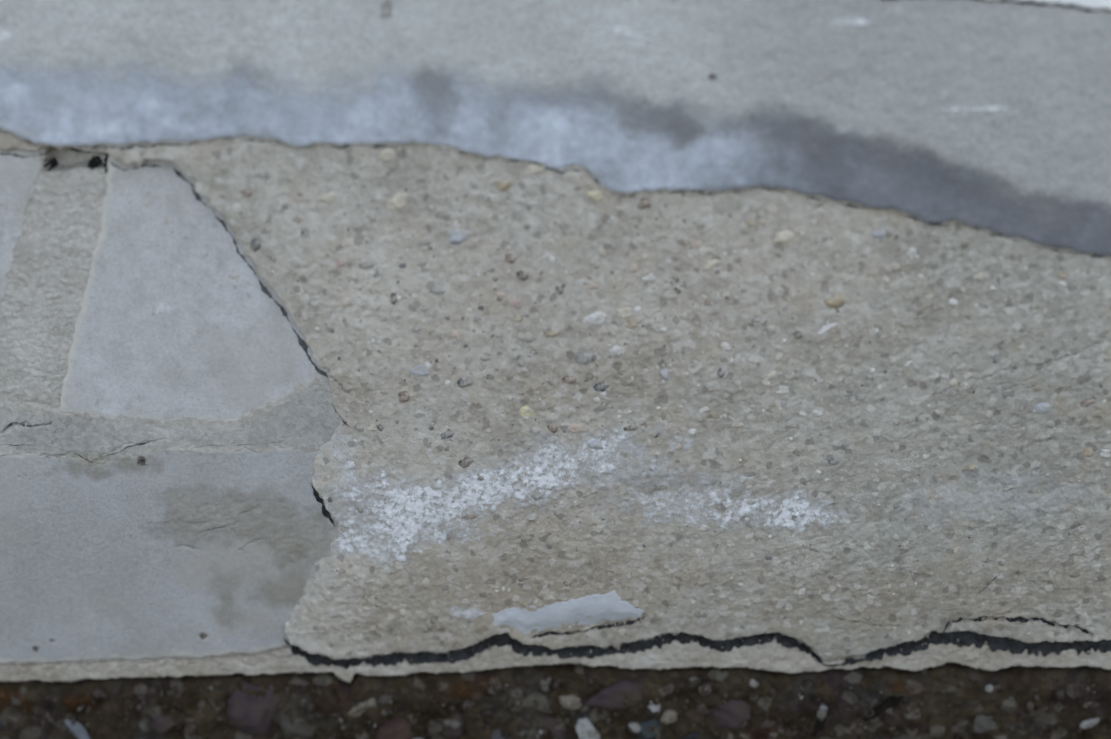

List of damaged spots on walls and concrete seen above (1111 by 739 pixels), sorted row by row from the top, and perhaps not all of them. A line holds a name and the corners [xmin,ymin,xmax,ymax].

crack [1,422,164,461]
water stain [326,429,837,565]